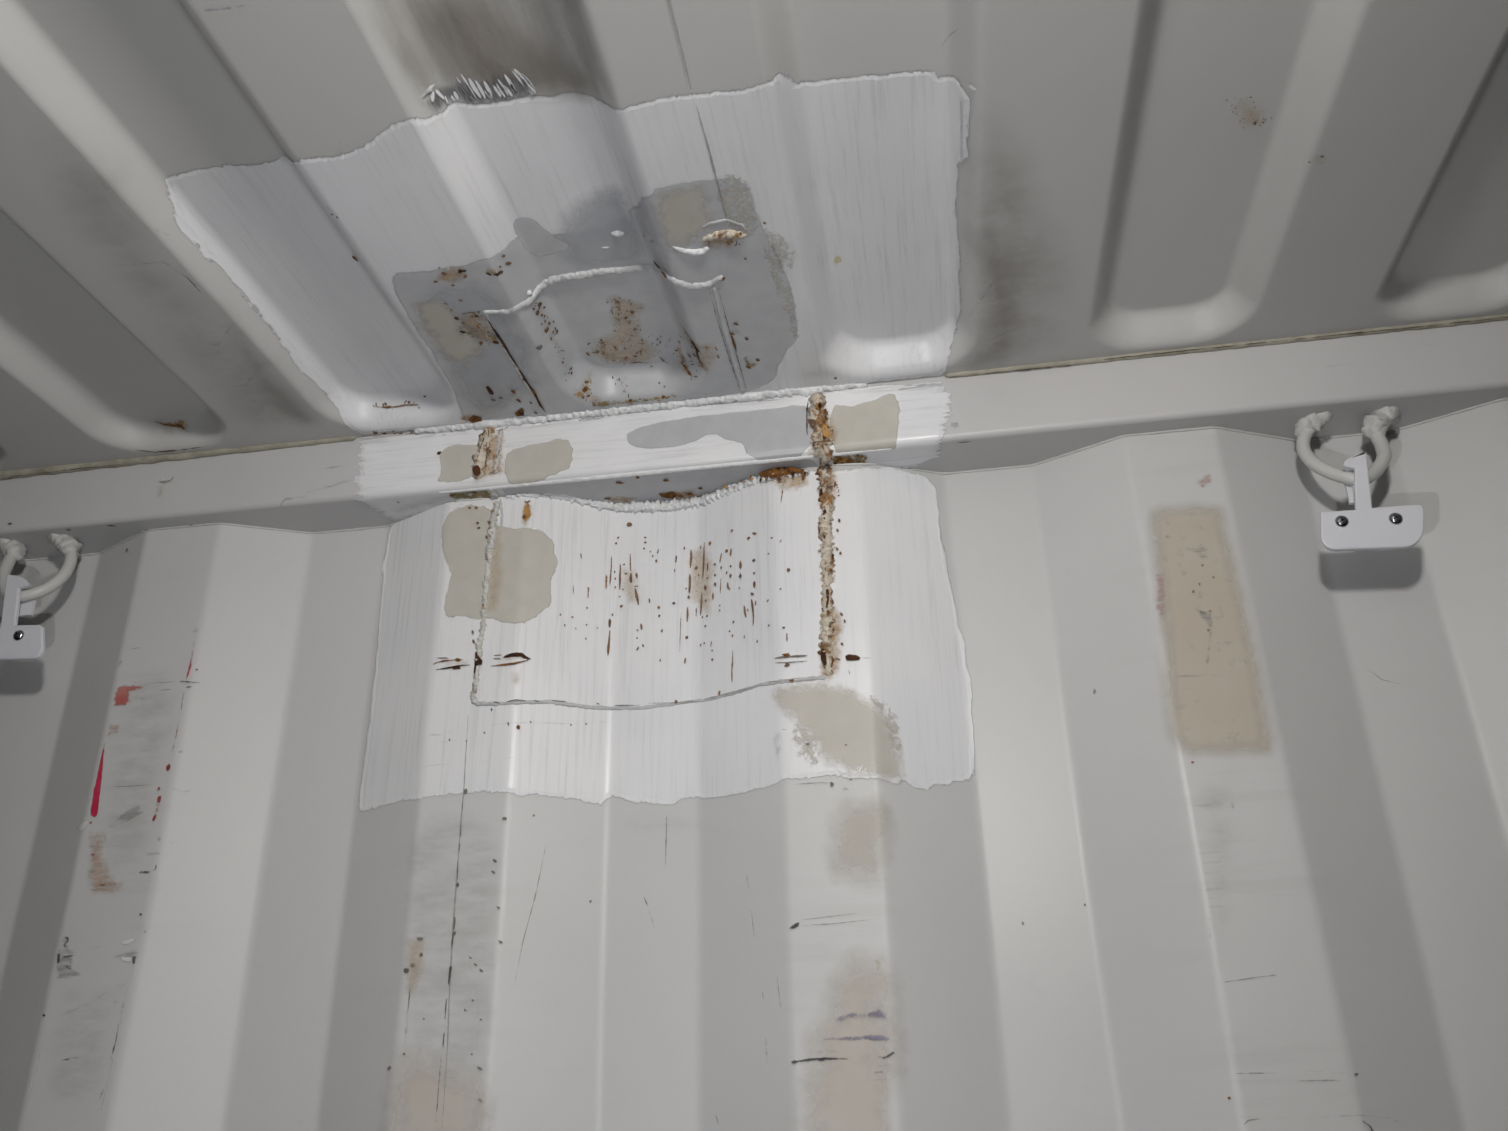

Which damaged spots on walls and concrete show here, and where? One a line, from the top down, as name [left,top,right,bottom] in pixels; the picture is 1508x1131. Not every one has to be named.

rust [532,297,760,406]
rust [449,491,493,560]
rust [721,467,809,500]
rust [810,405,880,672]
rust [560,522,790,695]